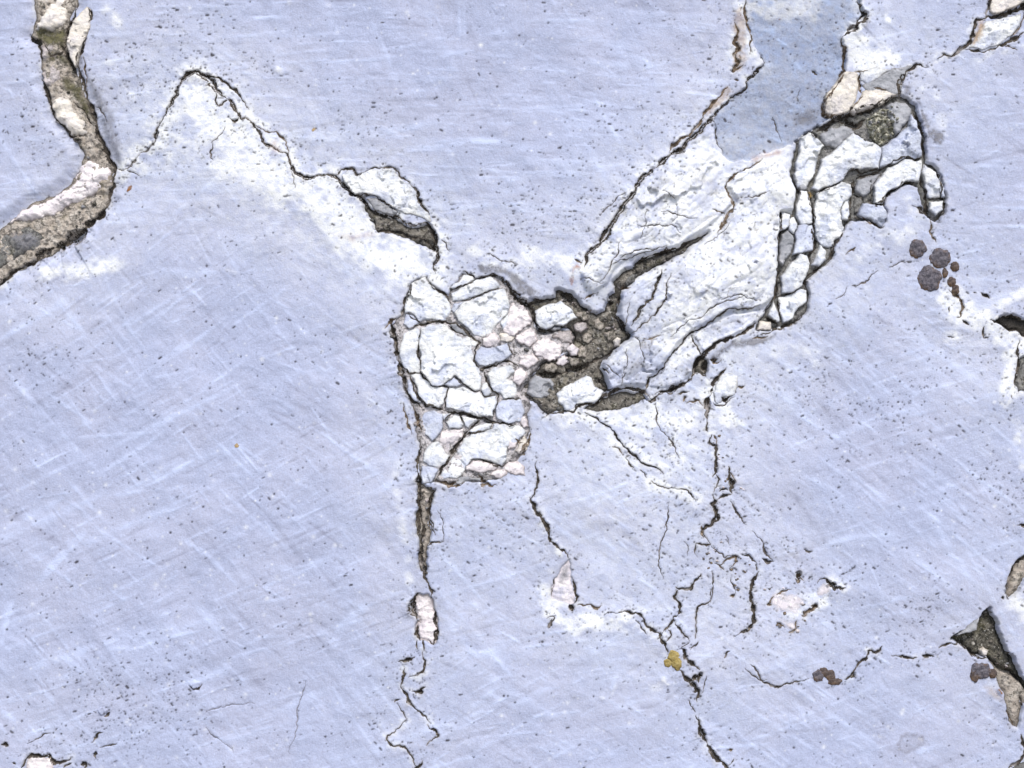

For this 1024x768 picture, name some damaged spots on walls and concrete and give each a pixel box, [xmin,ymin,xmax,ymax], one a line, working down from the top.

peeling [969,0,1024,50]
spalling [0,0,117,286]
crack [119,70,451,303]
spalling [714,0,945,331]
crack [465,253,555,330]
spalling [389,233,707,488]
spalling [991,314,1024,337]
crack [386,640,439,768]
crack [403,403,444,598]
crack [530,369,774,768]
crack [844,642,951,680]
spalling [951,608,1024,727]